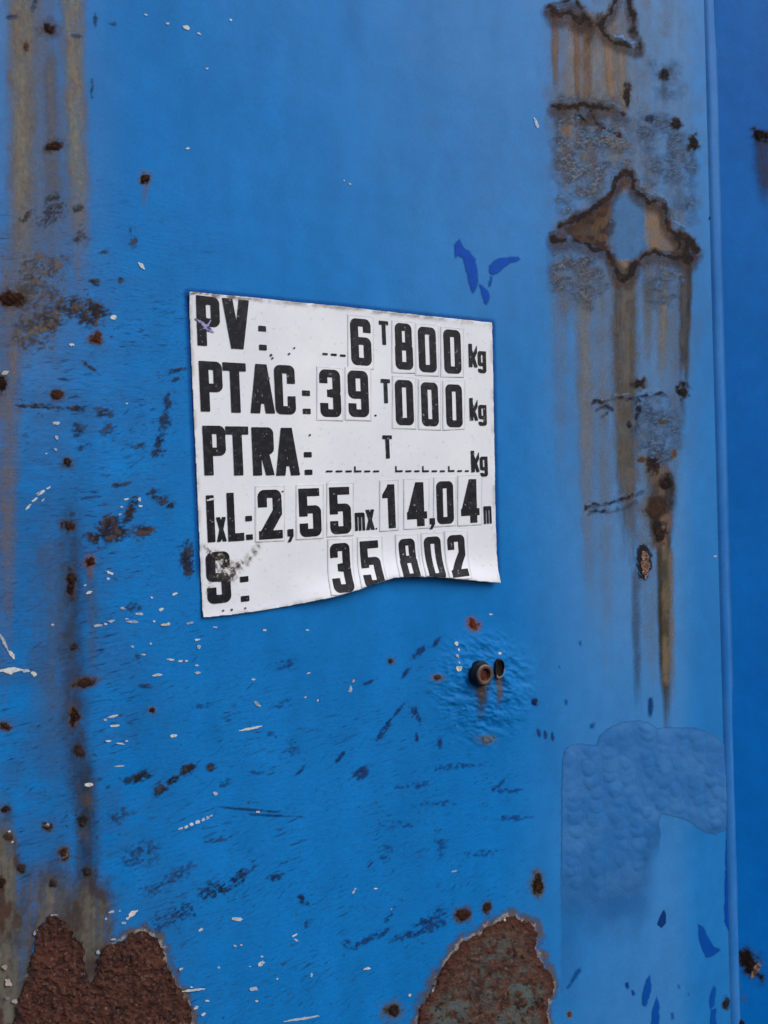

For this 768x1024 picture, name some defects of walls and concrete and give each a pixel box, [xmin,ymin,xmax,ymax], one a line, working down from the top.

corrosion [552,7,639,166]
corrosion [658,68,672,81]
corrosion [9,0,88,266]
corrosion [671,117,700,152]
corrosion [0,264,28,319]
corrosion [89,331,103,345]
corrosion [50,389,64,400]
corrosion [562,178,692,715]
corrosion [0,521,205,1024]
corrosion [531,870,544,897]
corrosion [411,902,558,1024]
corrosion [739,949,764,982]